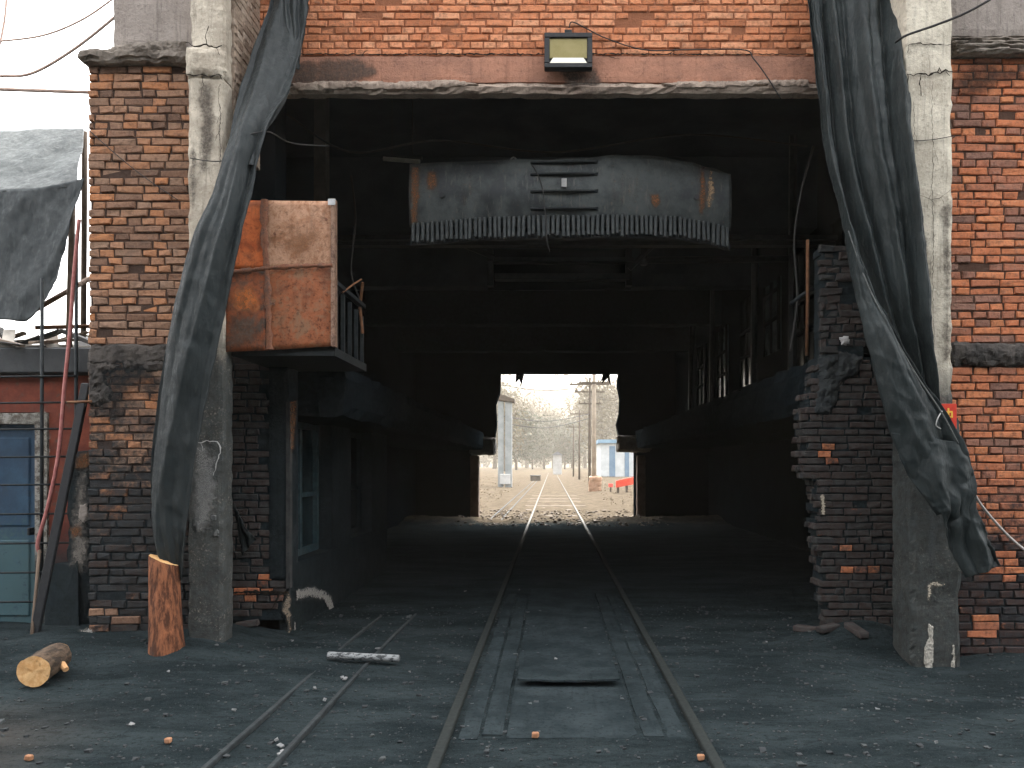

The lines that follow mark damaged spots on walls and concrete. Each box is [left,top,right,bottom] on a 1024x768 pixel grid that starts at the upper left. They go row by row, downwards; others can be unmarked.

crack [185,26,222,161]
water stain [292,58,376,83]
corrosion [410,167,437,223]
crack [907,42,953,344]